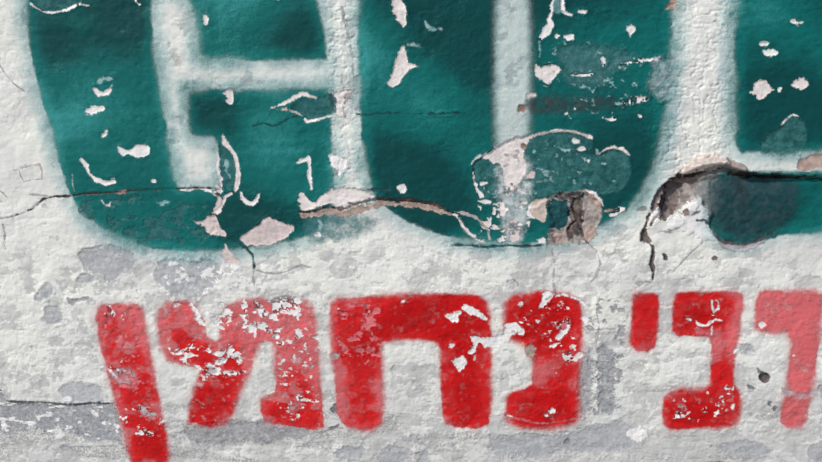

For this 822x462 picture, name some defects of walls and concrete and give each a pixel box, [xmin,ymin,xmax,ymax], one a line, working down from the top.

peeling [85,76,113,115]
peeling [391,0,407,27]
peeling [386,42,420,88]
peeling [517,0,676,121]
crack [0,163,137,249]
peeling [76,136,322,395]
crack [221,237,311,284]
crack [297,184,556,291]
peeling [471,129,631,246]
crack [635,180,702,286]
spalling [649,114,822,252]
peeling [445,291,640,462]